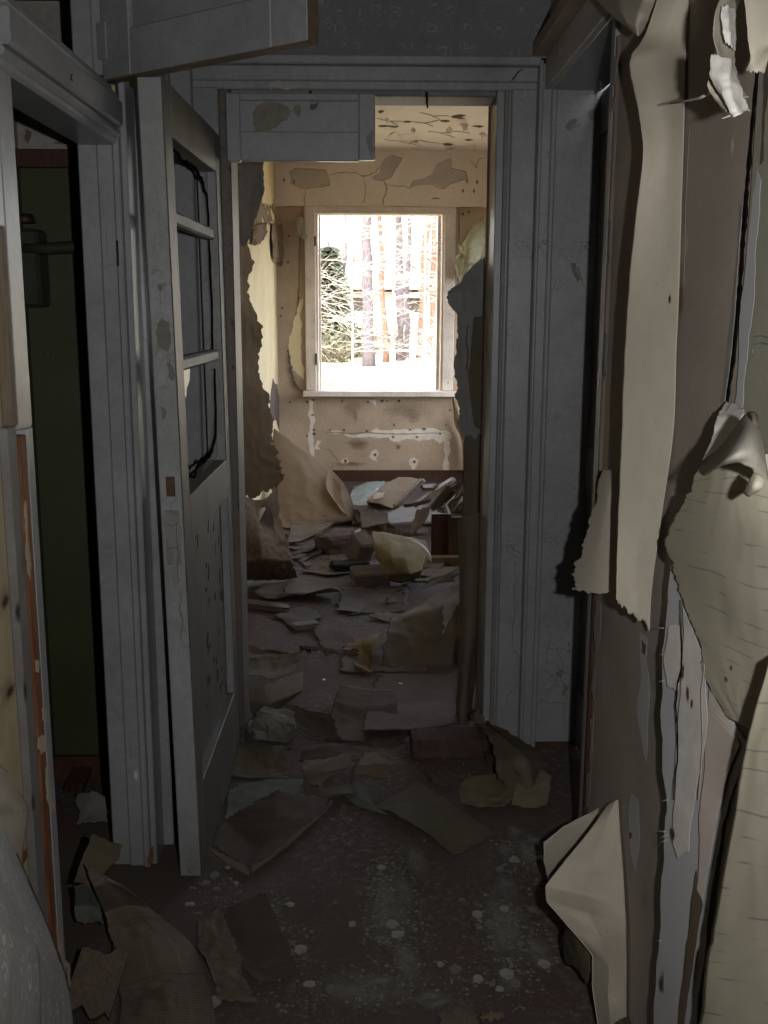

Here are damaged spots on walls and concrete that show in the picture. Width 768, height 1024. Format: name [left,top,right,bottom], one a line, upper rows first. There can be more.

peeling [252,80,322,131]
peeling [289,168,330,189]
crack [328,112,478,284]
peeling [408,114,487,189]
peeling [270,379,279,428]
peeling [308,400,451,470]
peeling [628,794,640,871]